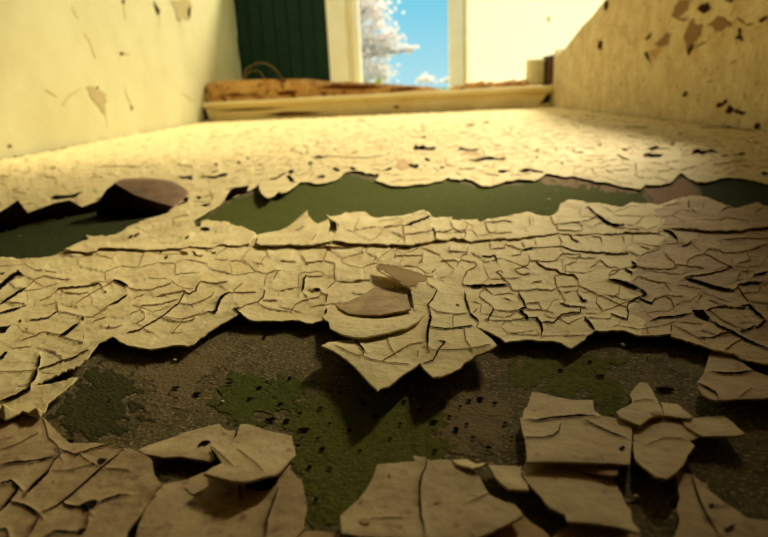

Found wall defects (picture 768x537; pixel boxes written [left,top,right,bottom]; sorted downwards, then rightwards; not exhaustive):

spalling [171,0,191,22]
spalling [644,31,669,62]
spalling [672,0,743,57]
spalling [87,86,107,114]
spalling [716,99,746,115]
crack [0,113,768,218]
peeling [0,107,768,253]
crack [0,200,768,402]
peeling [0,196,768,537]